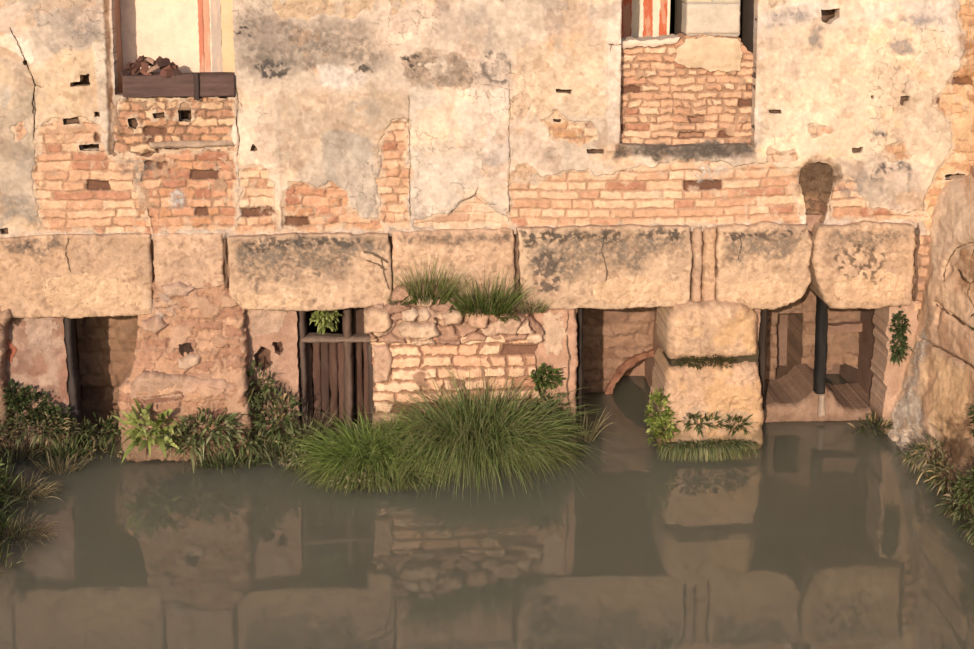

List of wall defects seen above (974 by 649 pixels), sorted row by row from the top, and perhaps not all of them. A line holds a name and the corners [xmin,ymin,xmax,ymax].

crack [9,27,41,137]
mould [261,61,288,79]
flaking render [10,96,801,236]
flaking render [829,0,974,236]
crack [913,224,921,300]
crack [943,242,974,317]